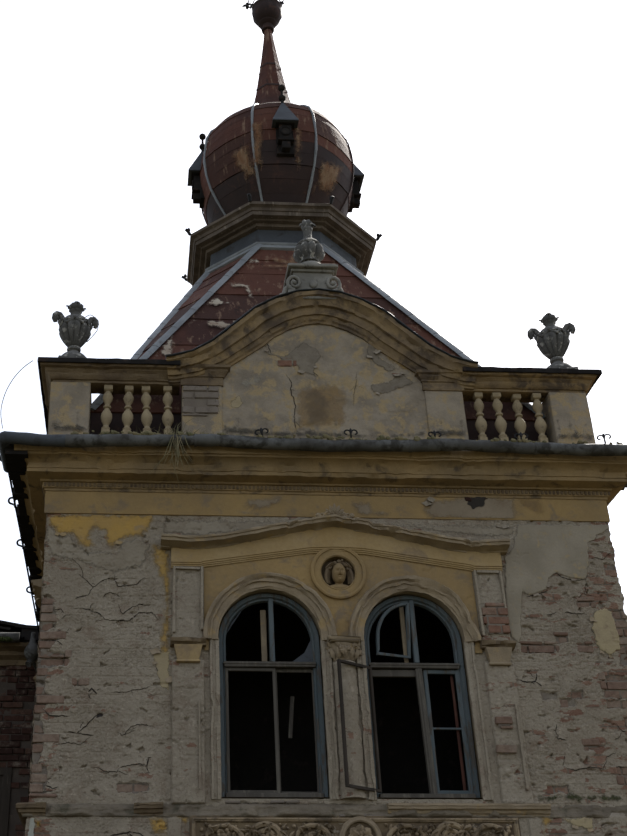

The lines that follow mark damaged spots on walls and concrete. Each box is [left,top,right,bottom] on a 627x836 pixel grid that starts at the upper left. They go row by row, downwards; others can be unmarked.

peeling [367,344,412,395]
crack [42,544,161,645]
peeling [47,514,172,690]
peeling [422,497,627,735]
spalling [29,599,72,797]
crack [43,664,160,744]
crack [92,757,154,774]
crack [107,826,151,836]